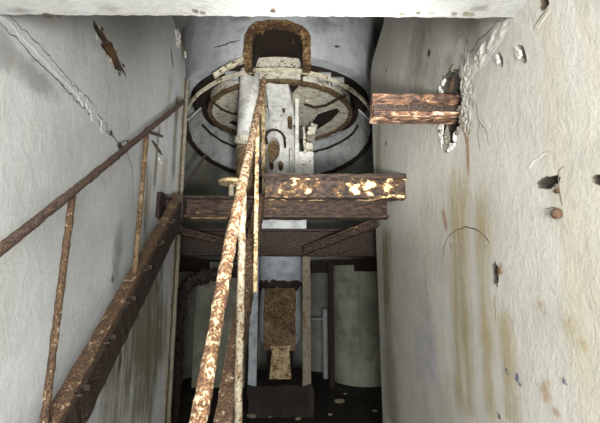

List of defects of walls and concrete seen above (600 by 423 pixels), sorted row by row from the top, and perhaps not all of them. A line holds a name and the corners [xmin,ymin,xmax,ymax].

crack [0,14,133,175]
spalling [93,19,127,78]
spalling [438,34,478,169]
spalling [514,44,527,63]